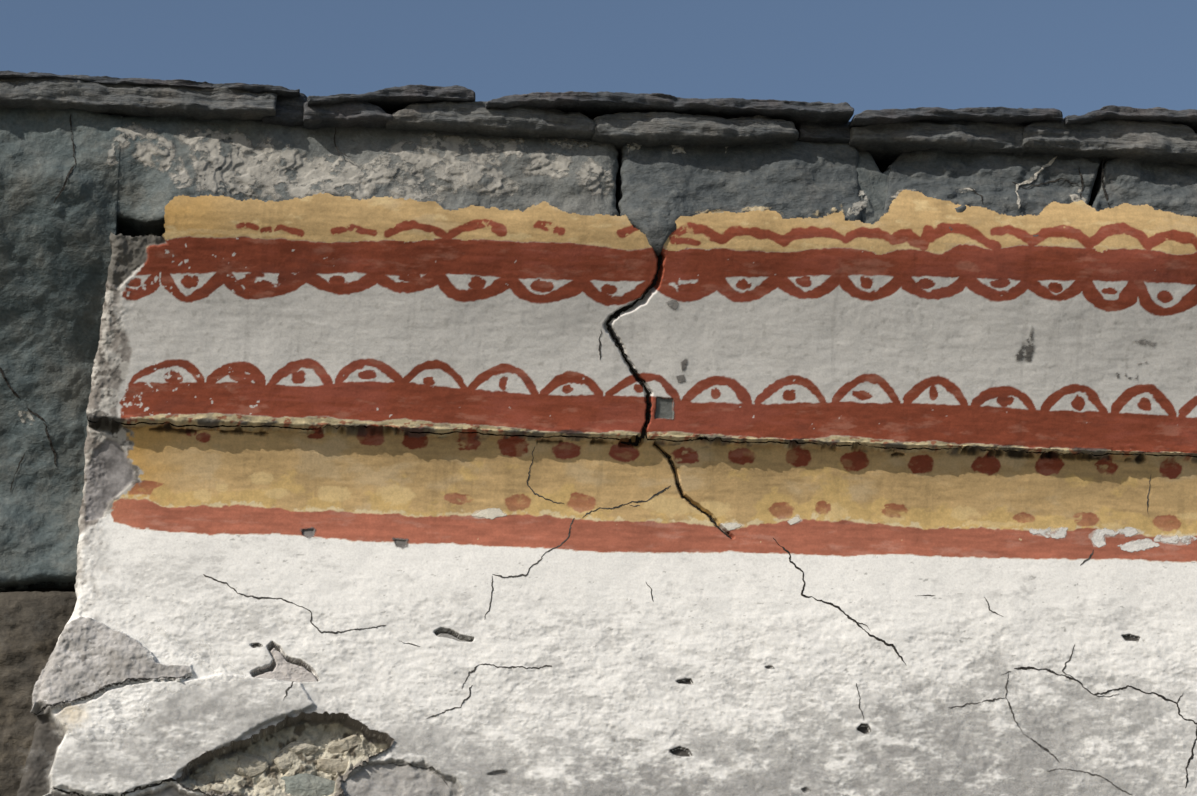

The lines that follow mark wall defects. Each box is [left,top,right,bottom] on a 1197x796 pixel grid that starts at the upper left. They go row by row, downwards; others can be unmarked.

peeling [106,122,613,201]
crack [1013,156,1111,209]
crack [0,368,57,492]
crack [484,255,732,620]
peeling [1030,527,1068,539]
peeling [1091,527,1197,552]
crack [203,574,420,647]
crack [773,538,906,665]
flaking render [31,616,318,741]
spalling [176,711,394,796]
crack [949,645,1197,795]